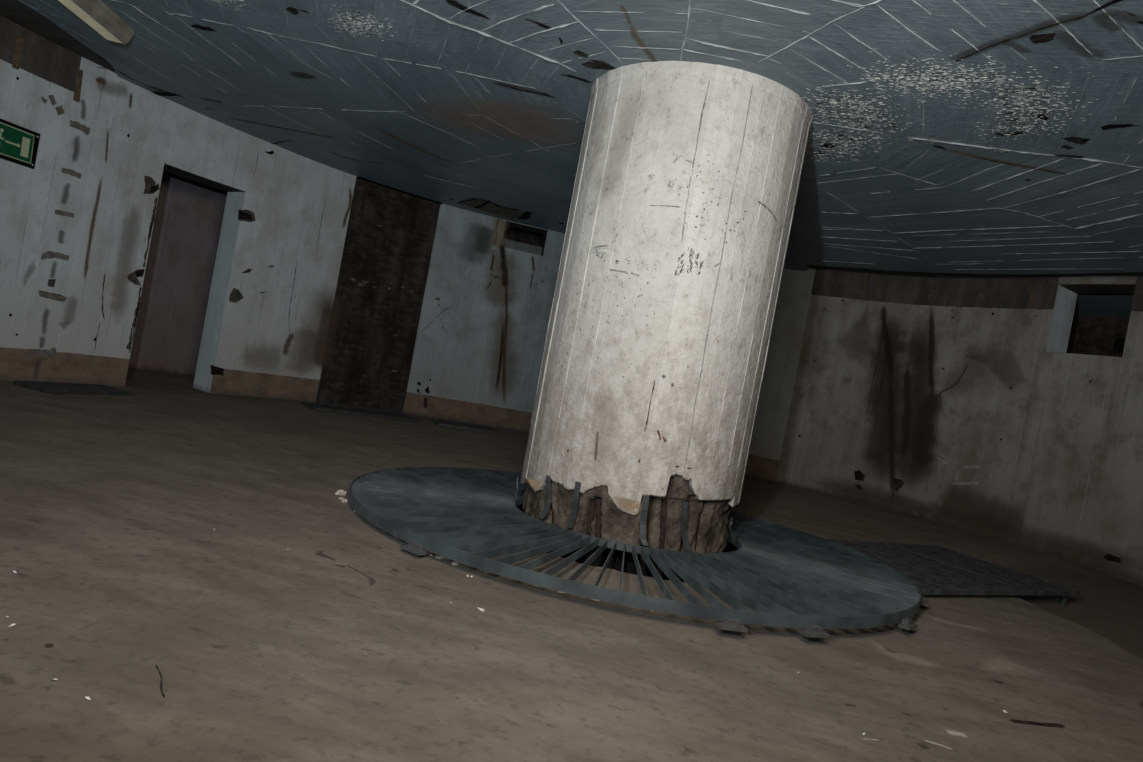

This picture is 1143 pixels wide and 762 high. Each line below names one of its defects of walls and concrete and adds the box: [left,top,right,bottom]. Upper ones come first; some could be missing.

crack [954,0,1143,62]
leakage [867,308,967,490]
spalling [522,466,732,578]